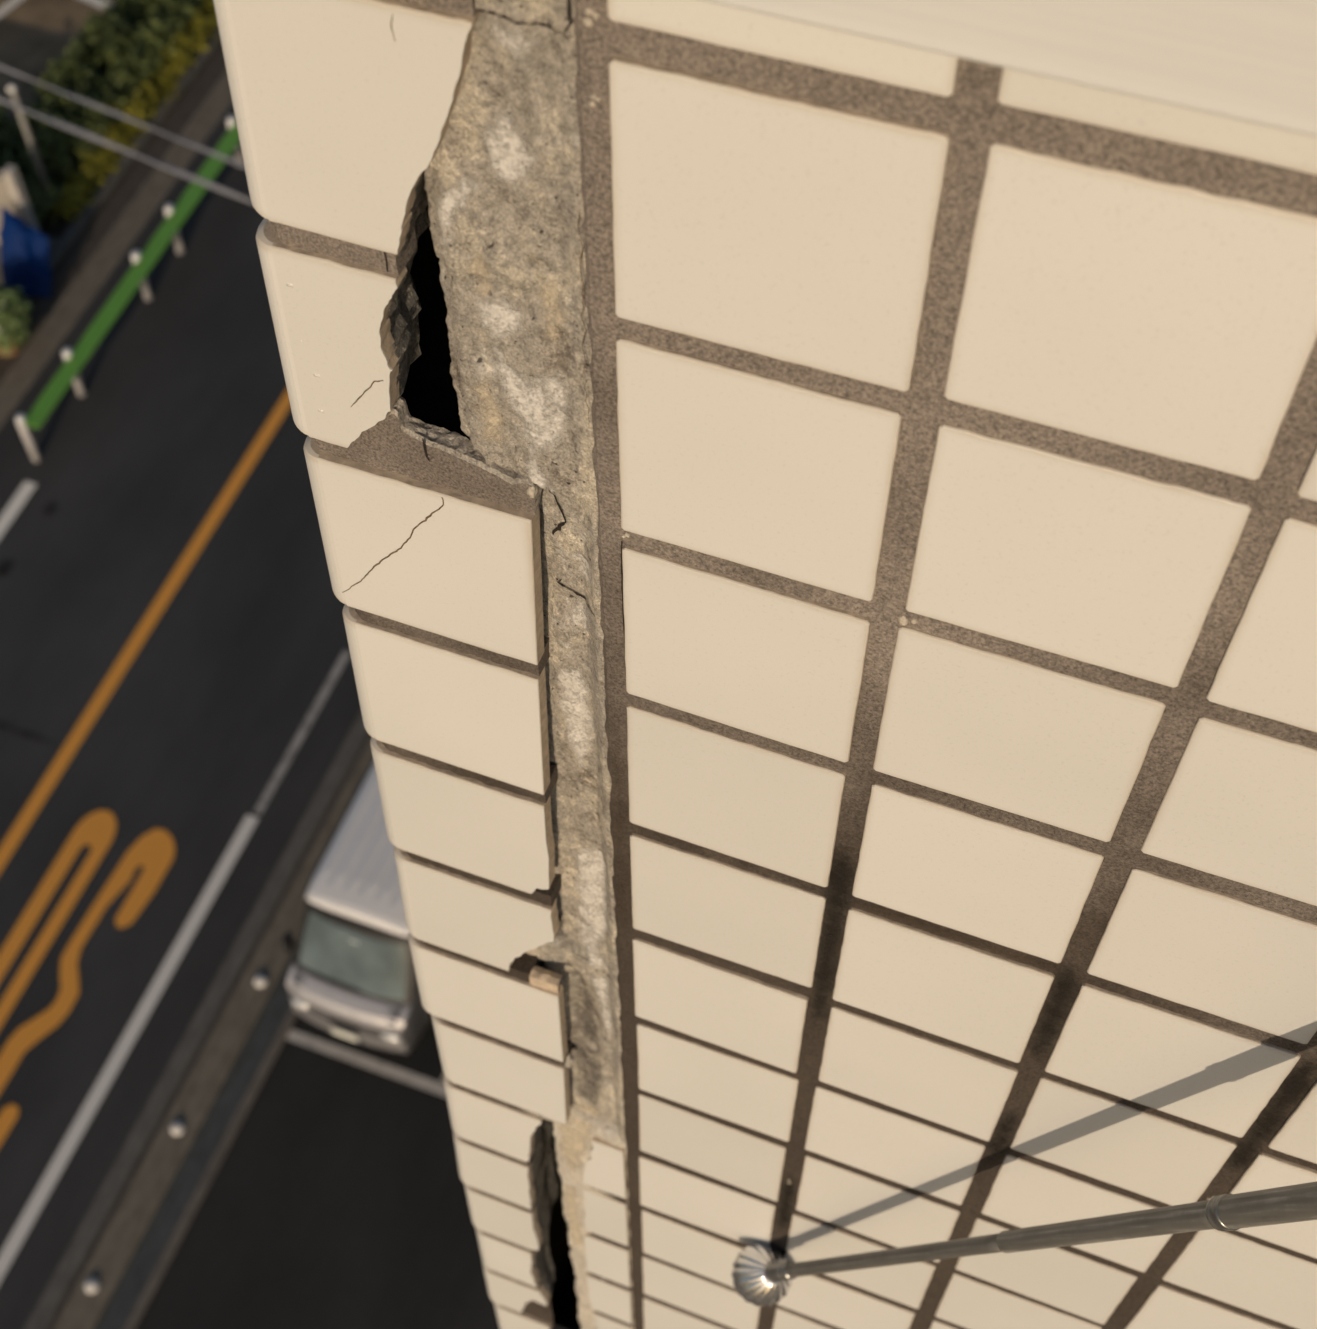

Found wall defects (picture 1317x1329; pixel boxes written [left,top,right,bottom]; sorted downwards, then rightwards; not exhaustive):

crack [342,497,444,593]
spalling [315,0,635,1329]